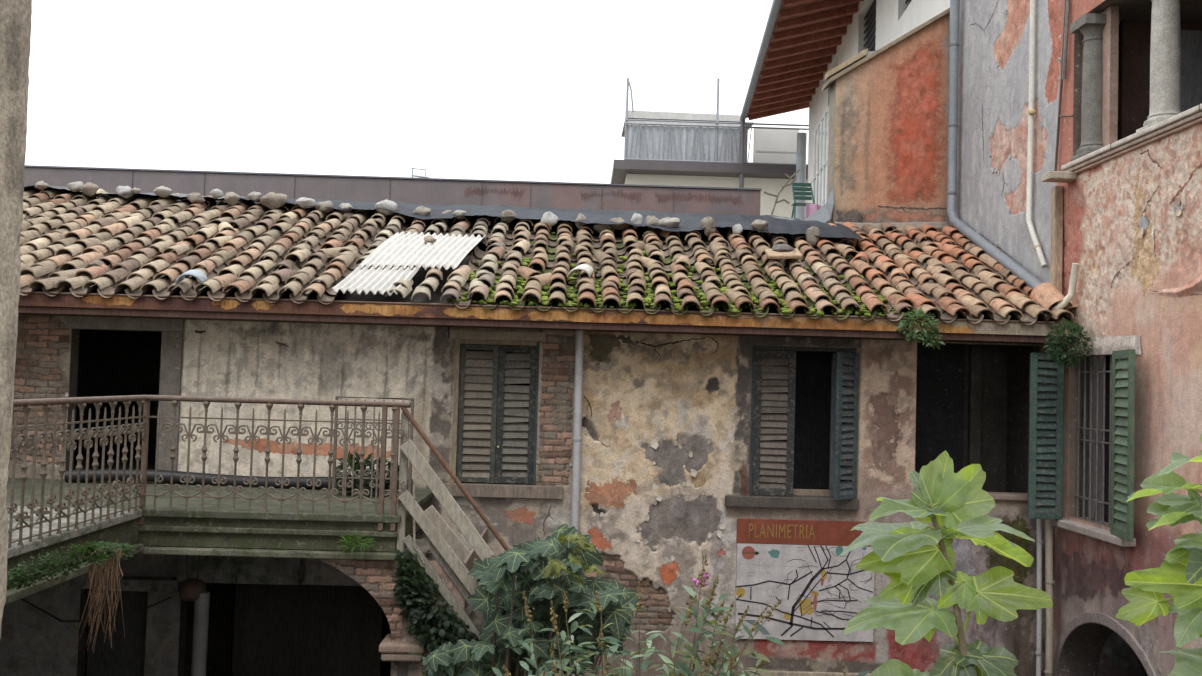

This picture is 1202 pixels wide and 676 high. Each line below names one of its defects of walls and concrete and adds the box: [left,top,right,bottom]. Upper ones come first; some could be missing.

flaking render [990,0,1061,215]
crack [1111,149,1202,296]
flaking render [536,334,599,486]
peeling [607,400,621,421]
crack [608,336,719,363]
peeling [585,477,637,551]
peeling [638,555,681,591]
spalling [636,434,726,558]